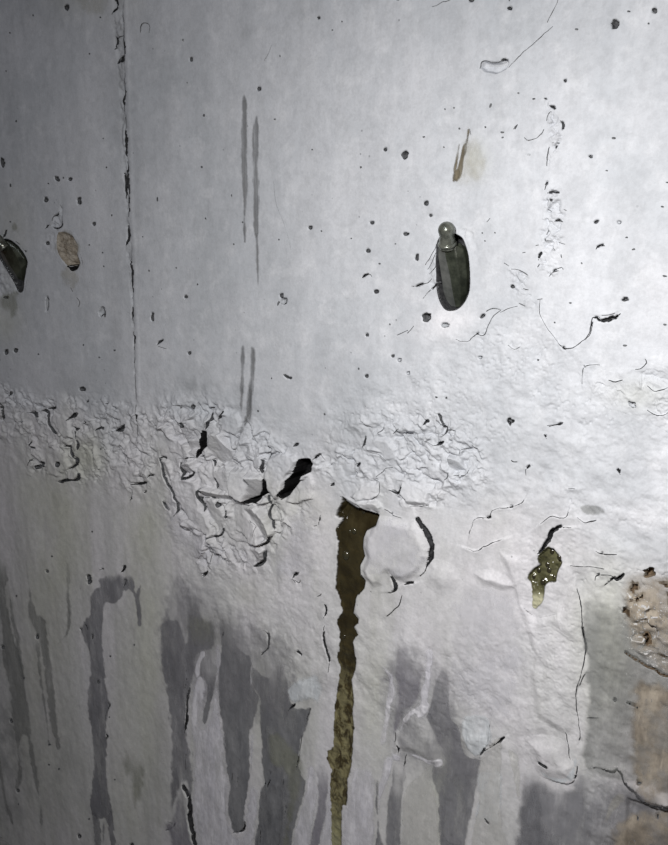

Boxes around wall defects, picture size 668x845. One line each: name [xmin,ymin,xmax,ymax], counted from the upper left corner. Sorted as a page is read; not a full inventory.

crack [539,303,621,349]
spalling [195,431,207,458]
spalling [241,458,313,504]
crack [570,551,624,585]
damp [82,577,141,845]
damp [161,498,520,845]
damp [499,547,604,737]
crack [552,590,668,811]
damp [517,761,668,845]